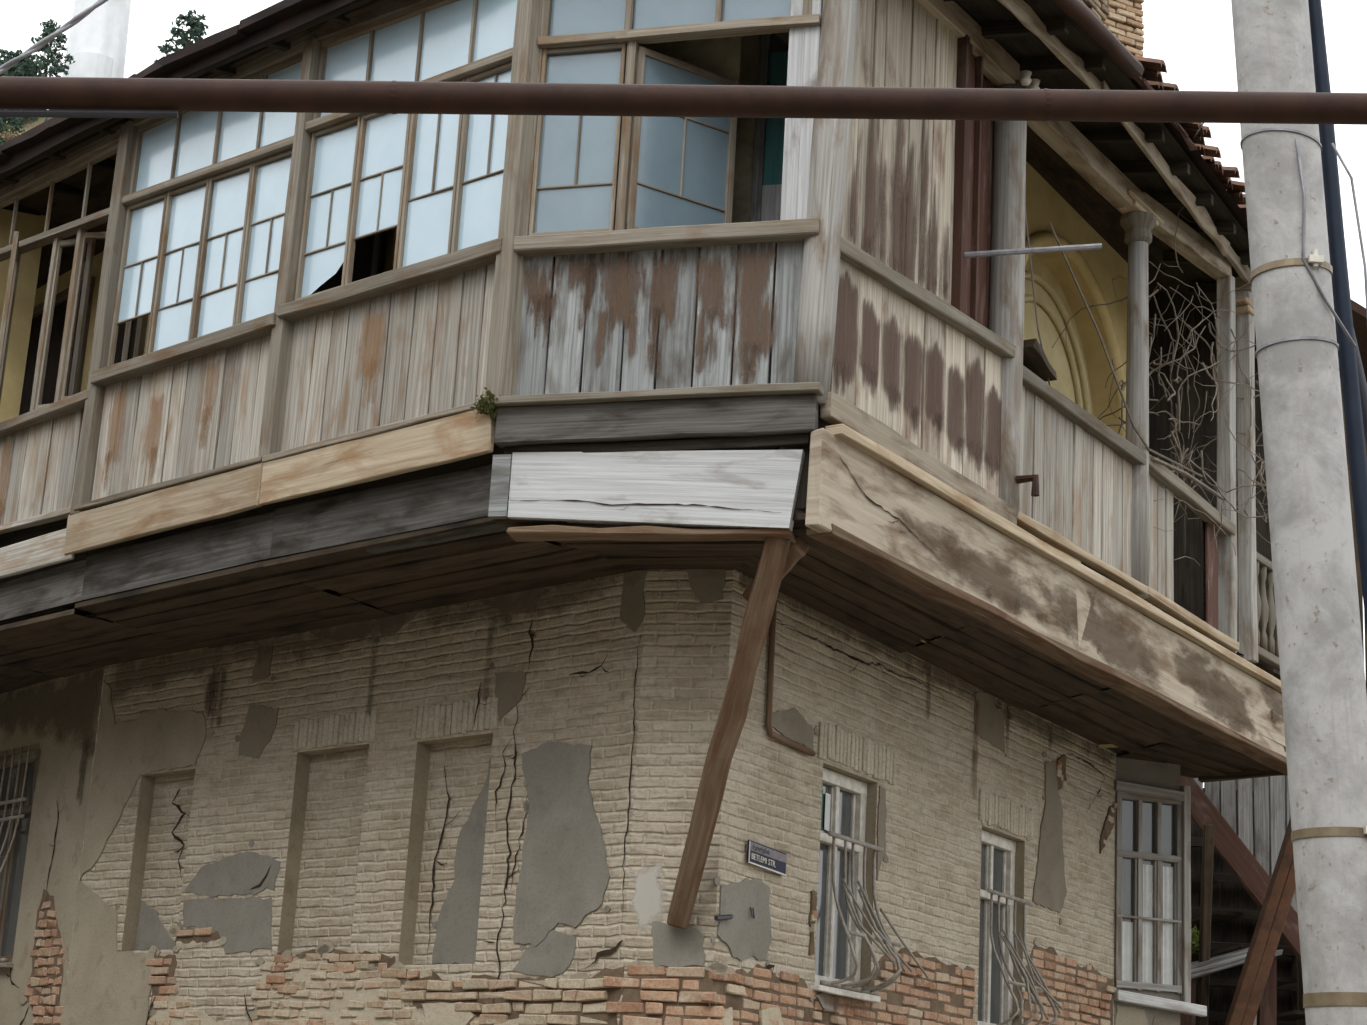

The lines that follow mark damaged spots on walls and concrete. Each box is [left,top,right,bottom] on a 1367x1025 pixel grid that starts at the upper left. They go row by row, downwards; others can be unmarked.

crack [171,789,191,880]
crack [427,766,460,956]
crack [474,620,537,1002]
crack [569,636,641,969]
spalling [1056,754,1067,790]
flaking render [19,889,69,1025]
flaking render [146,921,976,1025]
flaking render [1013,937,1117,1025]